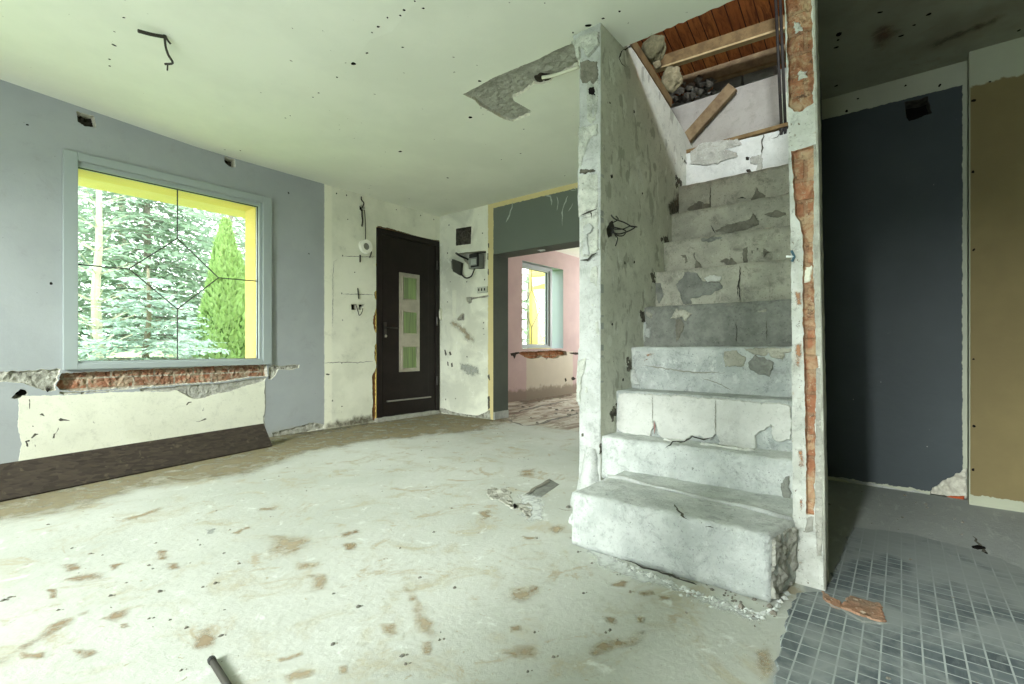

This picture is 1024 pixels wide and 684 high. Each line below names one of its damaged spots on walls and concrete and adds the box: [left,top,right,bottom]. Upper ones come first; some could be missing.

flaking render [785,0,814,112]
spalling [463,44,614,286]
flaking render [690,139,763,172]
flaking render [687,201,710,211]
flaking render [676,253,723,305]
flaking render [0,364,299,422]
flaking render [510,350,586,402]
crack [644,365,730,446]
peeling [616,392,792,451]
flaking render [701,144,823,600]
flaking render [930,468,967,499]